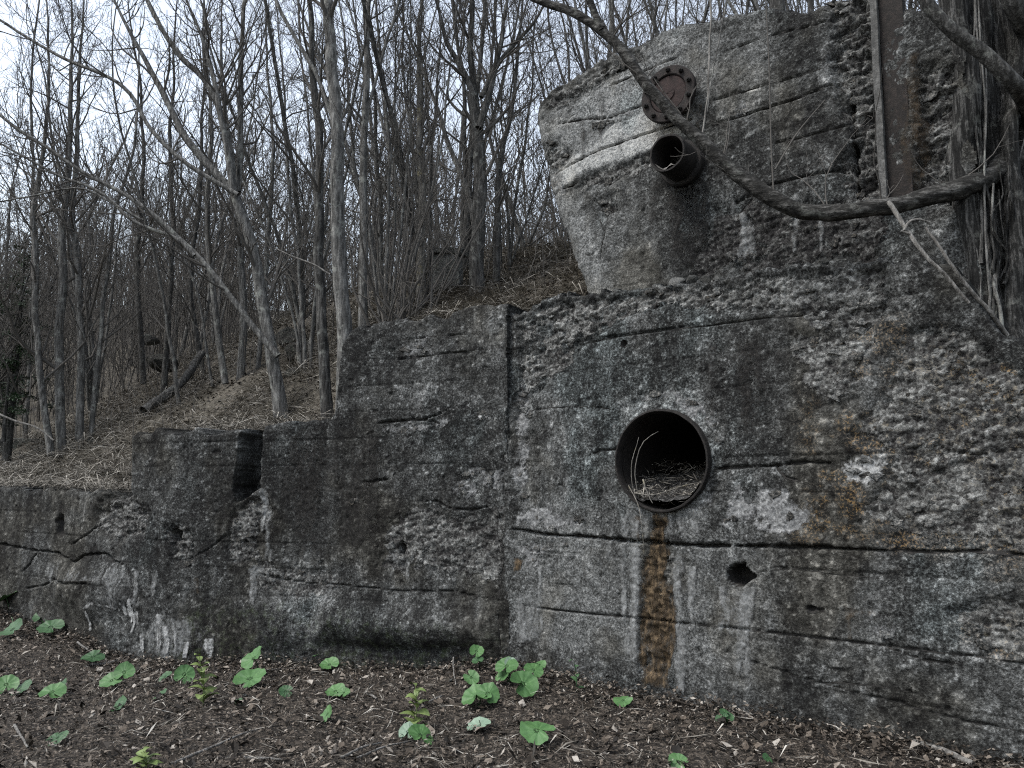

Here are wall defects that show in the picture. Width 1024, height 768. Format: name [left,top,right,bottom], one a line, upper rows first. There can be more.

spalling [915,67,960,190]
spalling [382,200,1024,581]
crack [0,525,121,588]
corrosion [639,513,677,686]